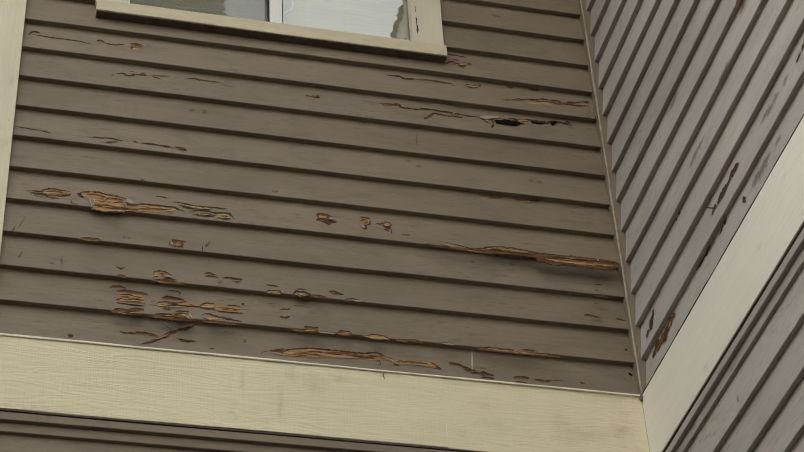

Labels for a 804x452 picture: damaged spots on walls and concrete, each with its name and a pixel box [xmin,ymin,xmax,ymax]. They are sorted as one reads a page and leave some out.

peeling [26,188,233,219]
peeling [315,213,337,226]
peeling [360,217,392,234]
peeling [109,285,148,306]
peeling [152,270,244,314]
peeling [120,322,198,344]
peeling [261,347,495,379]